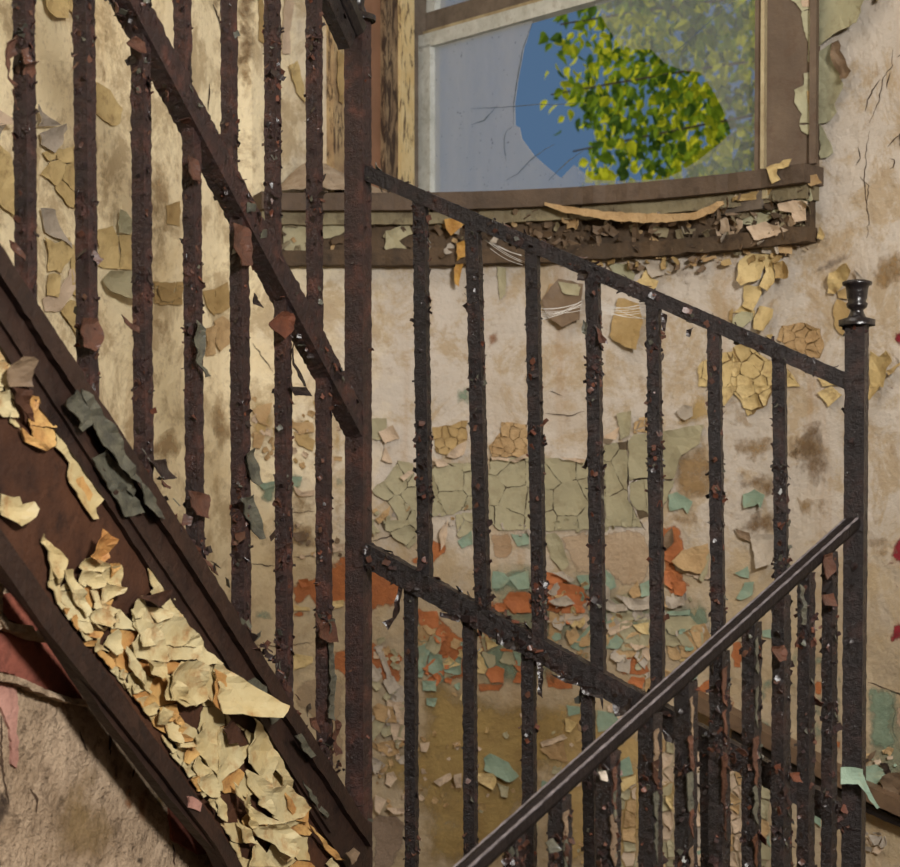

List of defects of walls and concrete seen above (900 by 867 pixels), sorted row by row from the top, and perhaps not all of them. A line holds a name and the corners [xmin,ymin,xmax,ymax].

peeling [544,159,791,223]
crack [857,51,900,238]
peeling [729,174,824,358]
peeling [0,494,39,526]
peeling [0,352,165,519]
peeling [432,420,473,549]
peeling [488,422,531,546]
peeling [544,457,591,658]
peeling [603,411,648,536]
peeling [722,344,772,416]
peeling [605,570,651,692]
peeling [40,529,360,867]